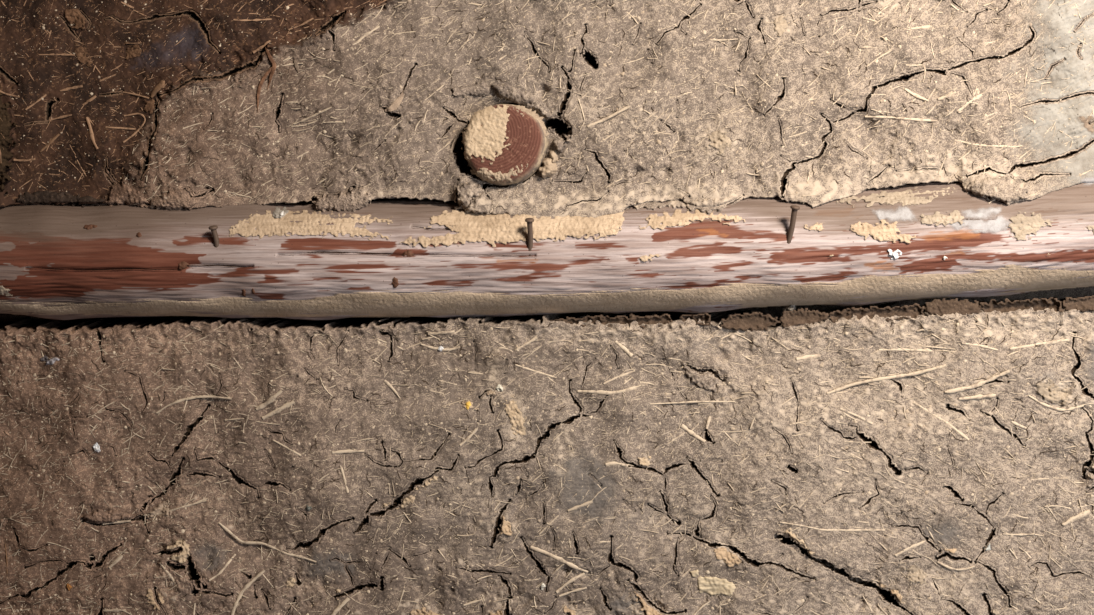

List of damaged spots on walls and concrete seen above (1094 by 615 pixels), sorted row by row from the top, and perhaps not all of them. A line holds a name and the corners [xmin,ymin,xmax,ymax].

spalling [61,3,87,30]
crack [0,0,1094,214]
crack [0,311,1094,615]